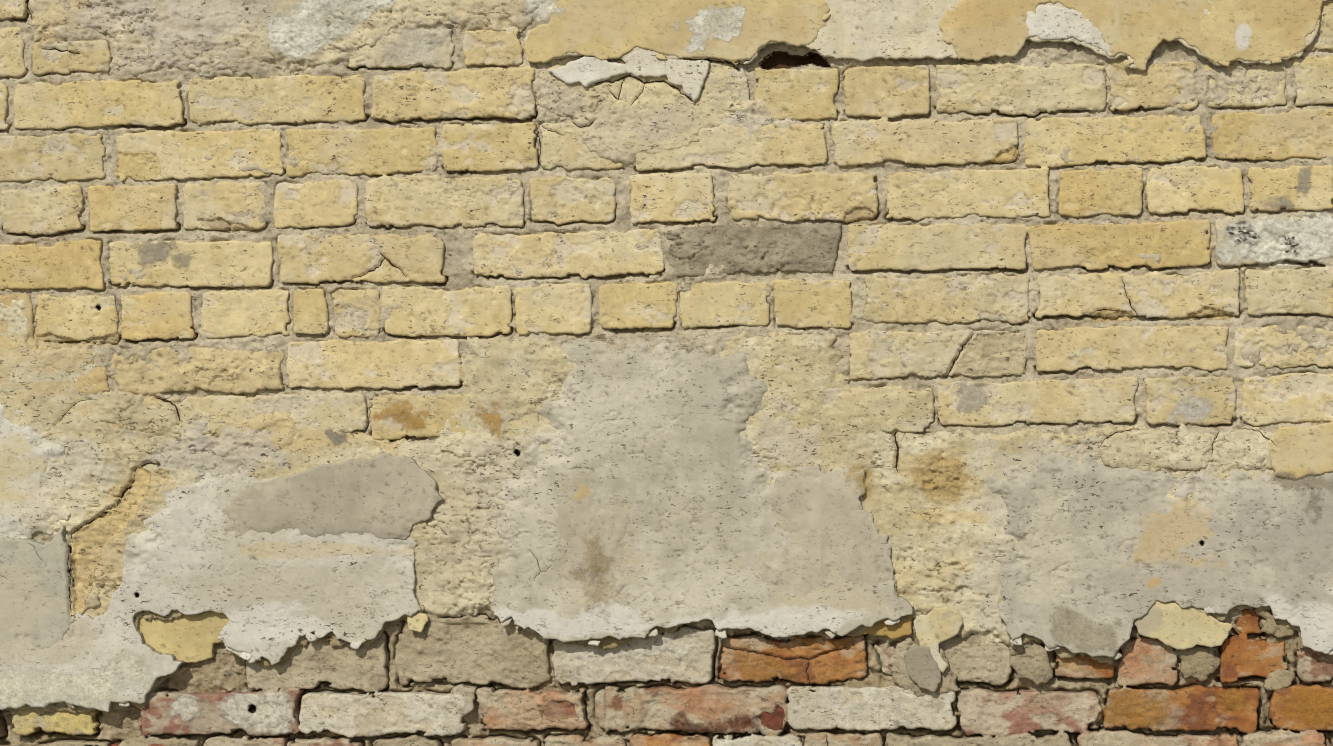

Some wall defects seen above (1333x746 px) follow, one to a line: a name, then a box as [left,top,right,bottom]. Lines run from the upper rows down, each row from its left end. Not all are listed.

spalling [28,0,1327,169]
spalling [115,152,162,181]
spalling [197,217,261,234]
spalling [666,206,879,277]
flaking render [0,292,1333,715]
spalling [537,700,578,722]
spalling [756,705,786,730]